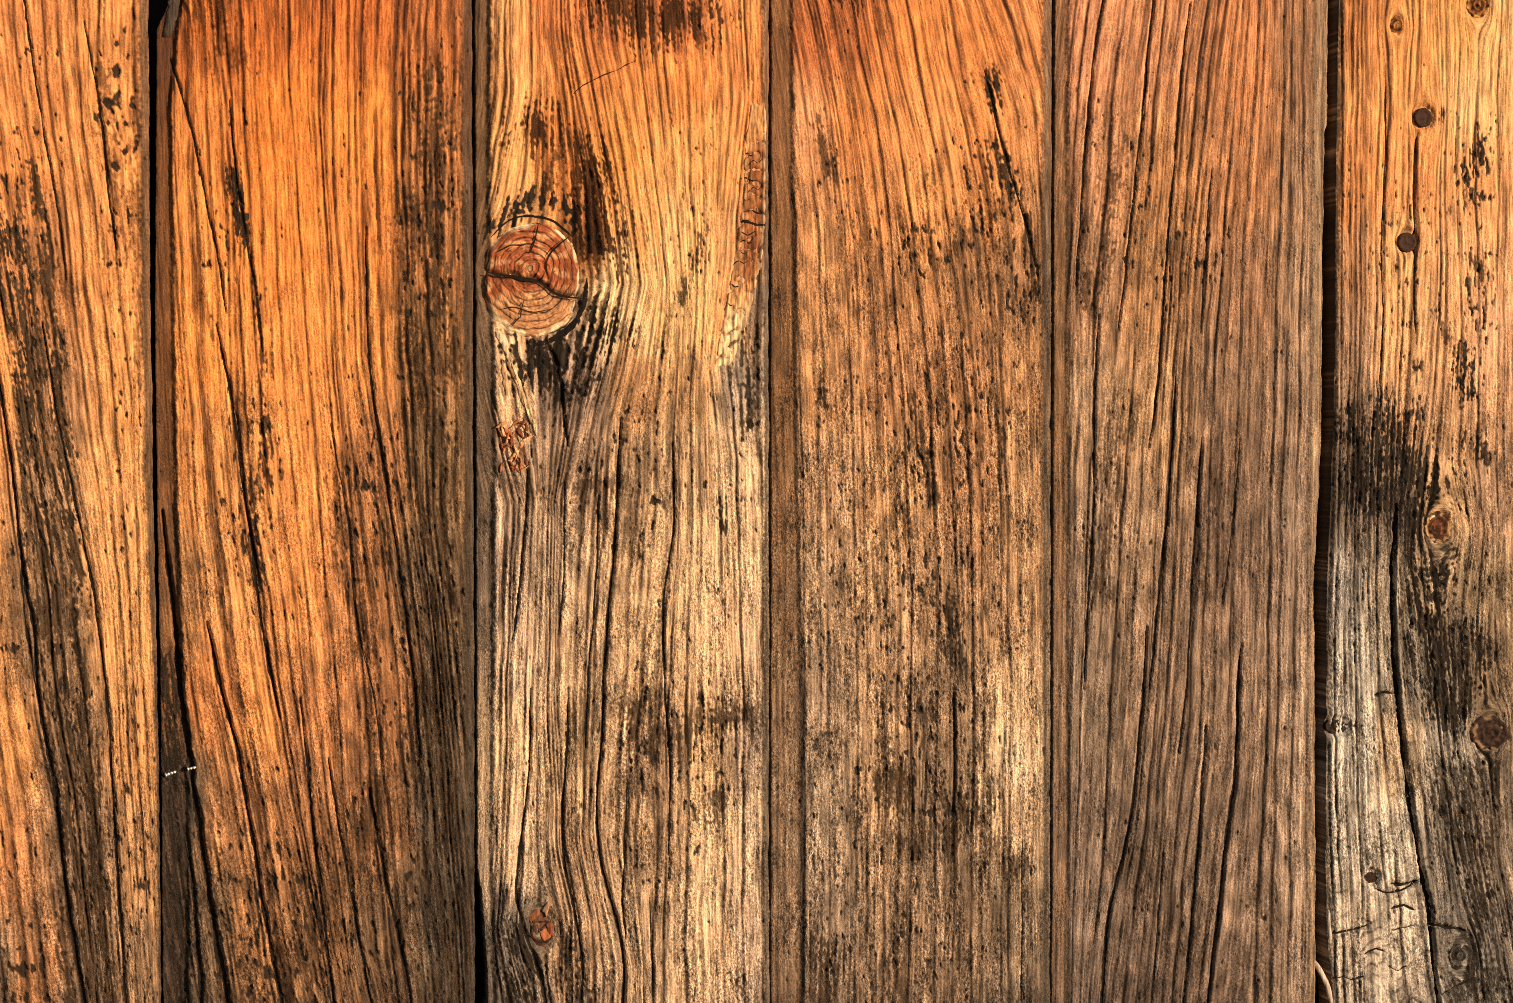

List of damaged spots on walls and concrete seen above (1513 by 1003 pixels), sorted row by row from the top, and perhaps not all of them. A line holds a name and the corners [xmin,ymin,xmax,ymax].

crack [1331,514,1476,1003]